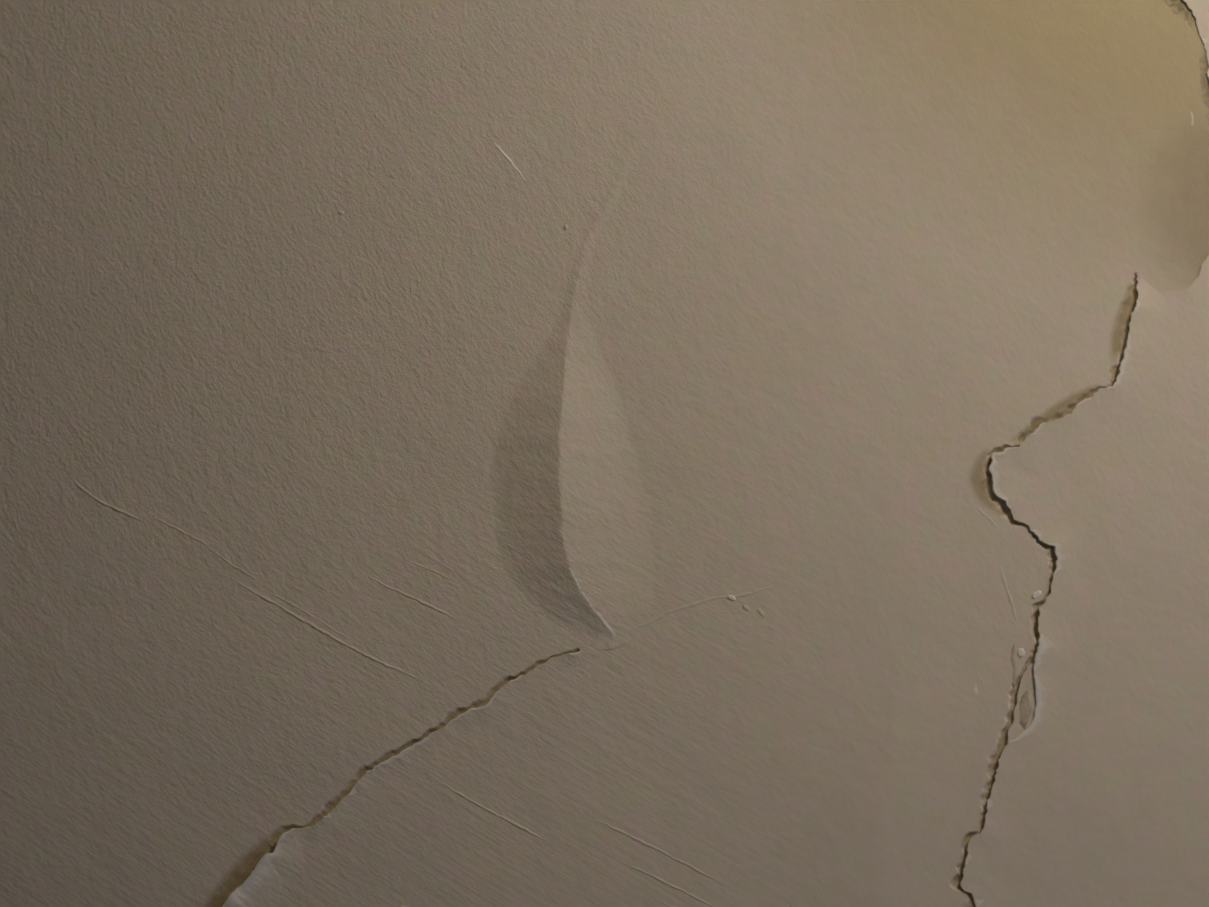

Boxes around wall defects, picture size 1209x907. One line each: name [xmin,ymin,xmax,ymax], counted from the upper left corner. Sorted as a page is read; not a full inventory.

flaking render [1183,0,1209,81]
crack [948,273,1141,907]
crack [203,643,606,907]